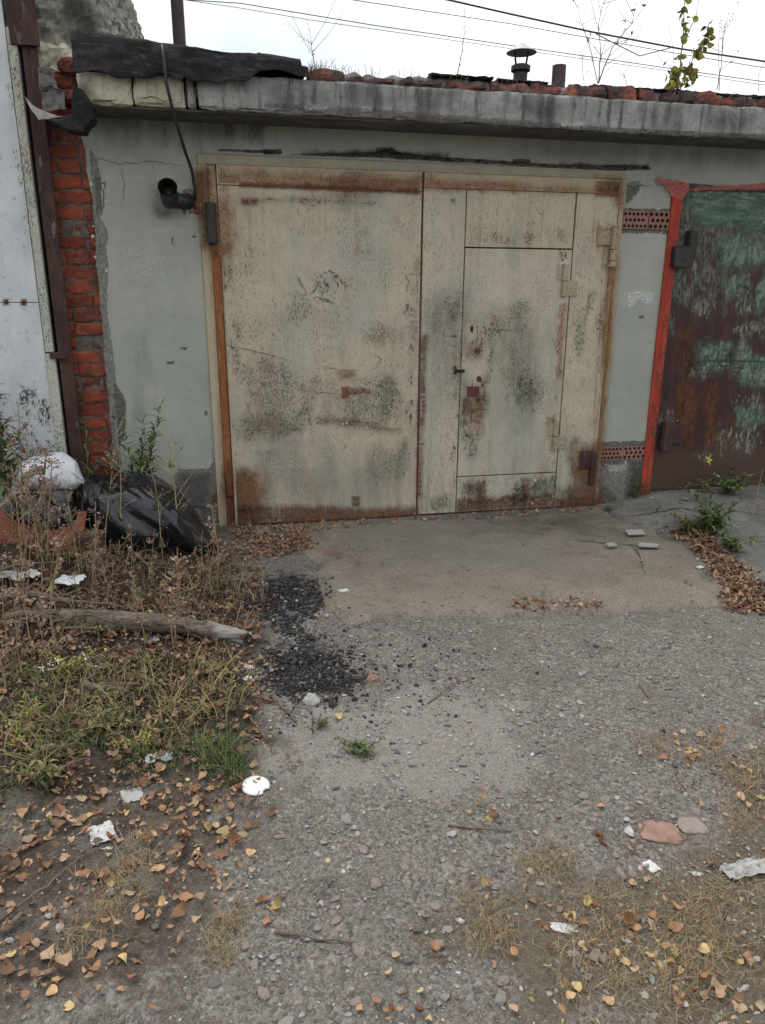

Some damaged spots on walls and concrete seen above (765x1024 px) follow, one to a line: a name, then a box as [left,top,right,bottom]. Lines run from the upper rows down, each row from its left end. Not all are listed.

spalling [88,149,126,471]
crack [100,158,180,207]
rust [196,169,626,526]
peeling [621,176,765,462]